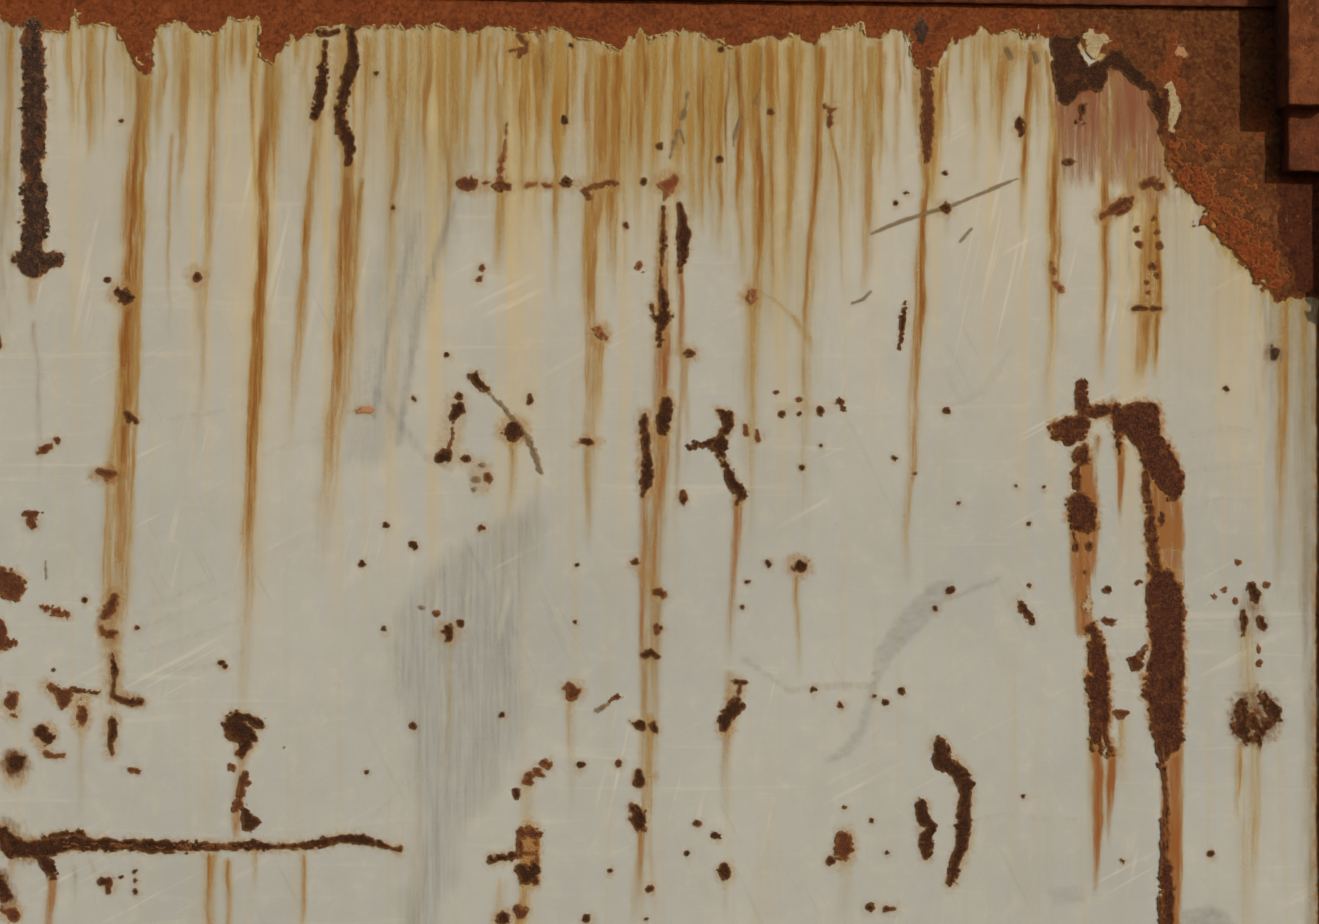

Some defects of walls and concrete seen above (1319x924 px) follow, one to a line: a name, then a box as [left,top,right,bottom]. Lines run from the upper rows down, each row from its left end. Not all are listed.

corrosion [0,0,1319,727]
corrosion [1047,378,1188,924]
corrosion [1,724,66,777]
corrosion [107,716,118,756]
corrosion [222,709,266,833]
corrosion [487,825,546,924]
corrosion [615,716,659,788]
corrosion [629,802,648,863]
corrosion [717,678,749,738]
corrosion [915,797,938,860]
corrosion [932,735,977,887]
corrosion [1230,682,1283,787]